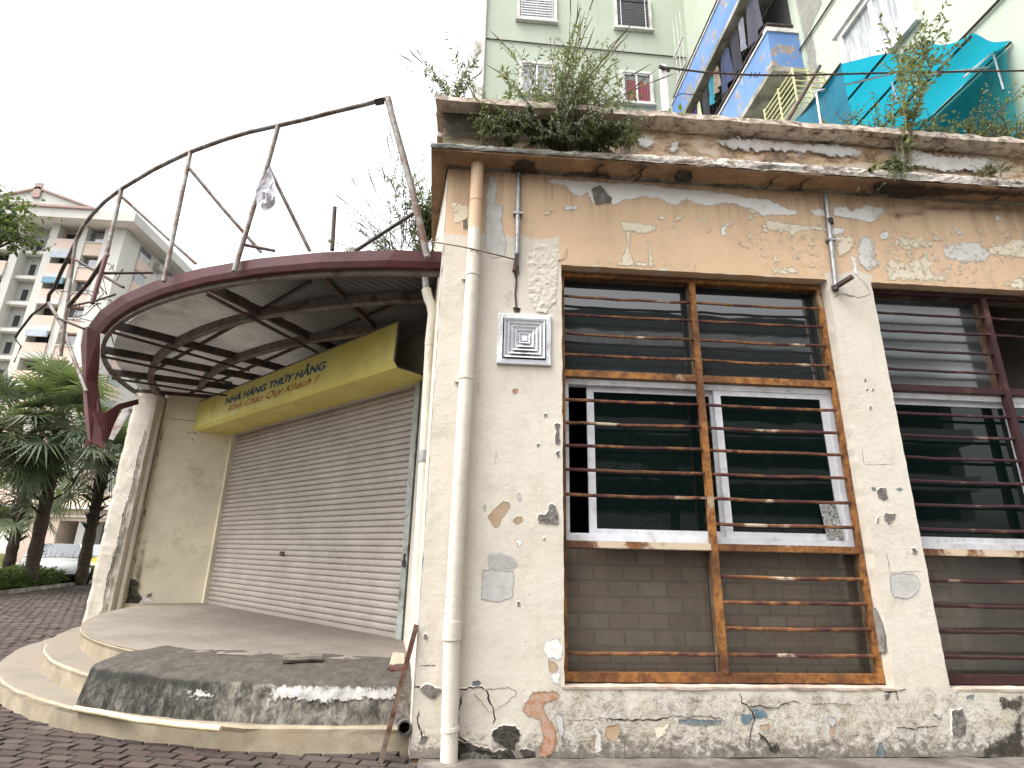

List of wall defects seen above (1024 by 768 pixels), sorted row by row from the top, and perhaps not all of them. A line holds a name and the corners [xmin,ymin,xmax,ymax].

peeling [637,134,654,149]
peeling [716,136,861,158]
peeling [893,149,998,173]
peeling [544,170,1024,290]
peeling [483,493,523,528]
spalling [536,503,559,541]
spalling [871,487,902,525]
peeling [481,569,521,607]
peeling [890,573,920,598]
crack [415,665,516,751]
peeling [458,638,564,759]
crack [569,693,854,759]